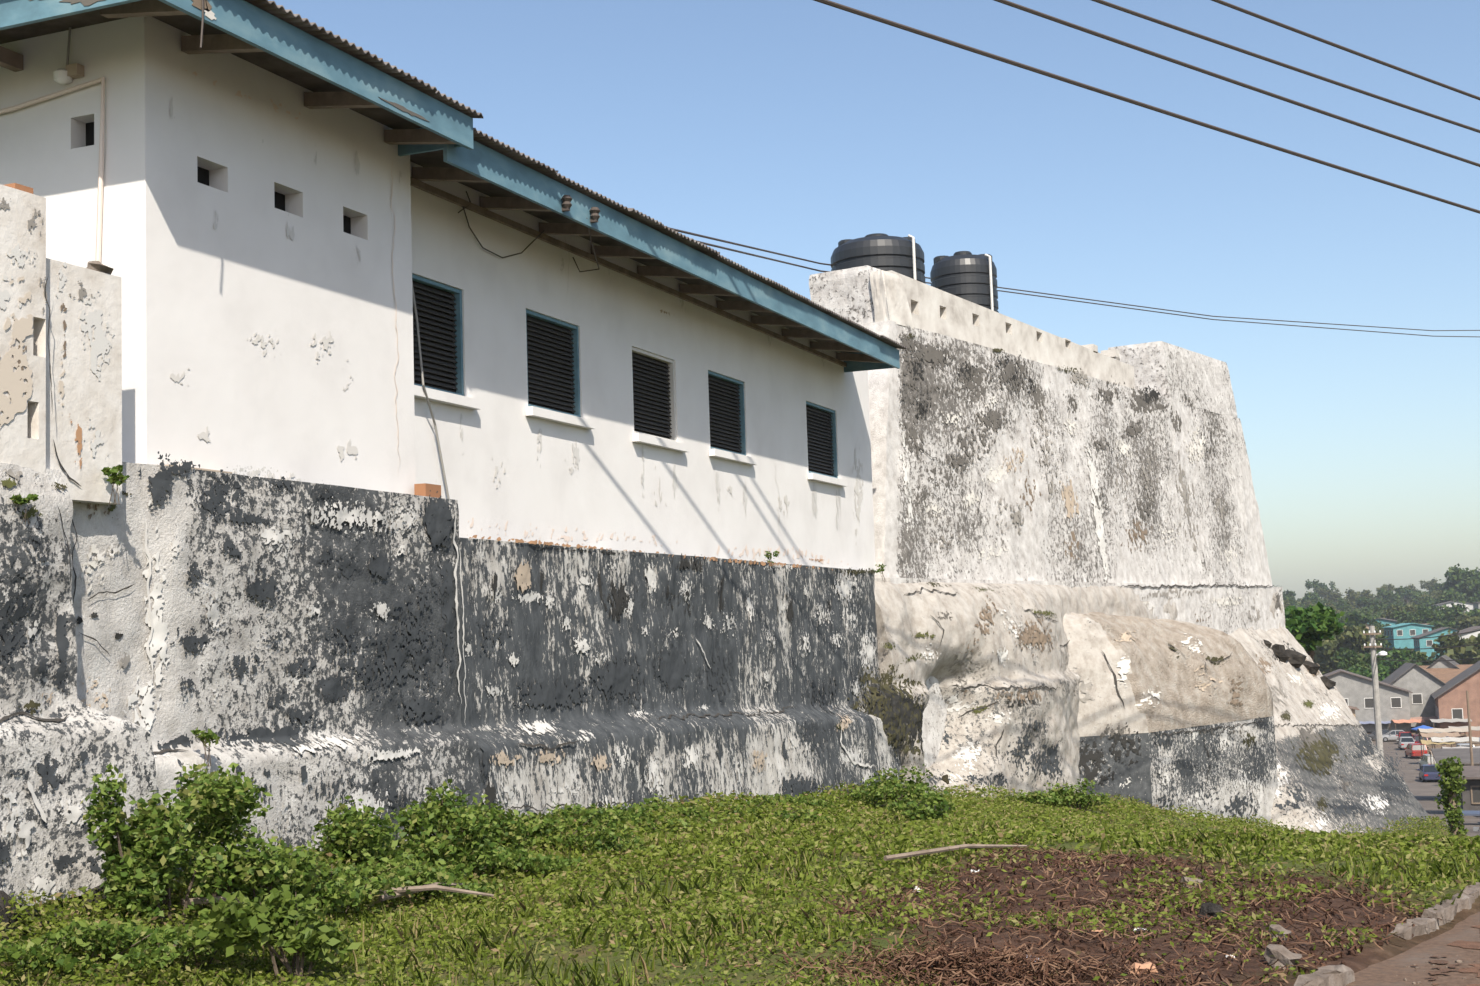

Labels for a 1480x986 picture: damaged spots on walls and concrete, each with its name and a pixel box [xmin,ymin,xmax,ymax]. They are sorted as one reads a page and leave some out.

flaking render [0,276,38,427]
damp [836,426,864,544]
damp [896,333,1228,553]
peeling [81,526,182,733]
damp [459,518,849,621]
damp [786,593,794,630]
damp [1061,531,1080,560]
peeling [482,683,705,812]
damp [716,737,725,768]
flaking render [700,750,768,806]
damp [1199,729,1259,750]